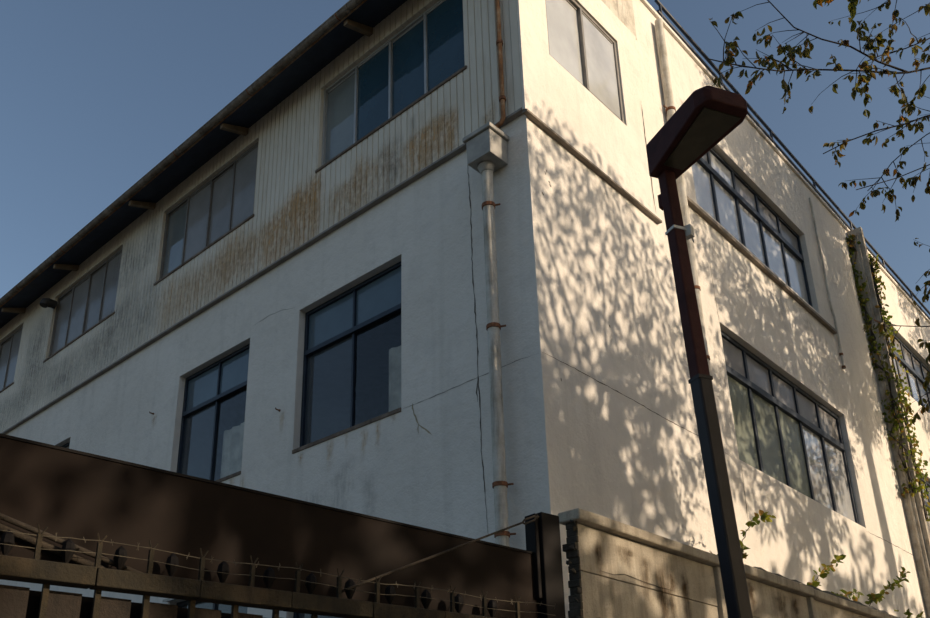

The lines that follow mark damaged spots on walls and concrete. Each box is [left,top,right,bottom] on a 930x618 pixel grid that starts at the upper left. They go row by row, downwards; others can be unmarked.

crack [403,174,699,530]
water stain [645,561,689,618]